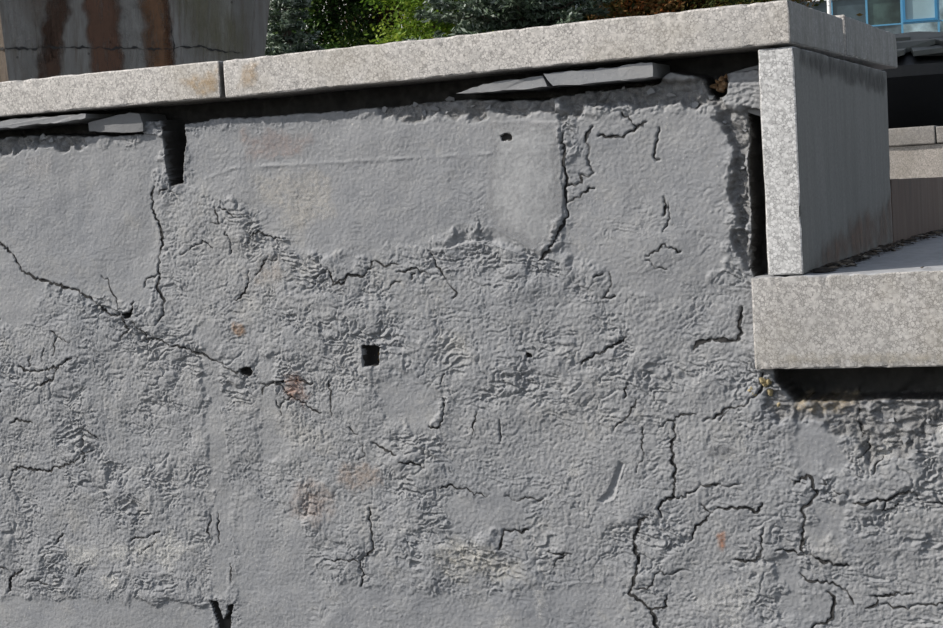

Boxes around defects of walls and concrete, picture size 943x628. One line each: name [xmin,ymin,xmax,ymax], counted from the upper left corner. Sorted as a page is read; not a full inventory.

rust [38,0,71,79]
rust [83,0,124,73]
rust [139,0,174,68]
spalling [382,63,761,220]
crack [539,113,660,260]
crack [324,250,457,298]
flaking render [421,223,542,261]
crack [0,187,421,466]
spalling [362,345,380,366]
crack [10,429,98,482]
spalling [830,401,941,457]
crack [613,373,943,628]